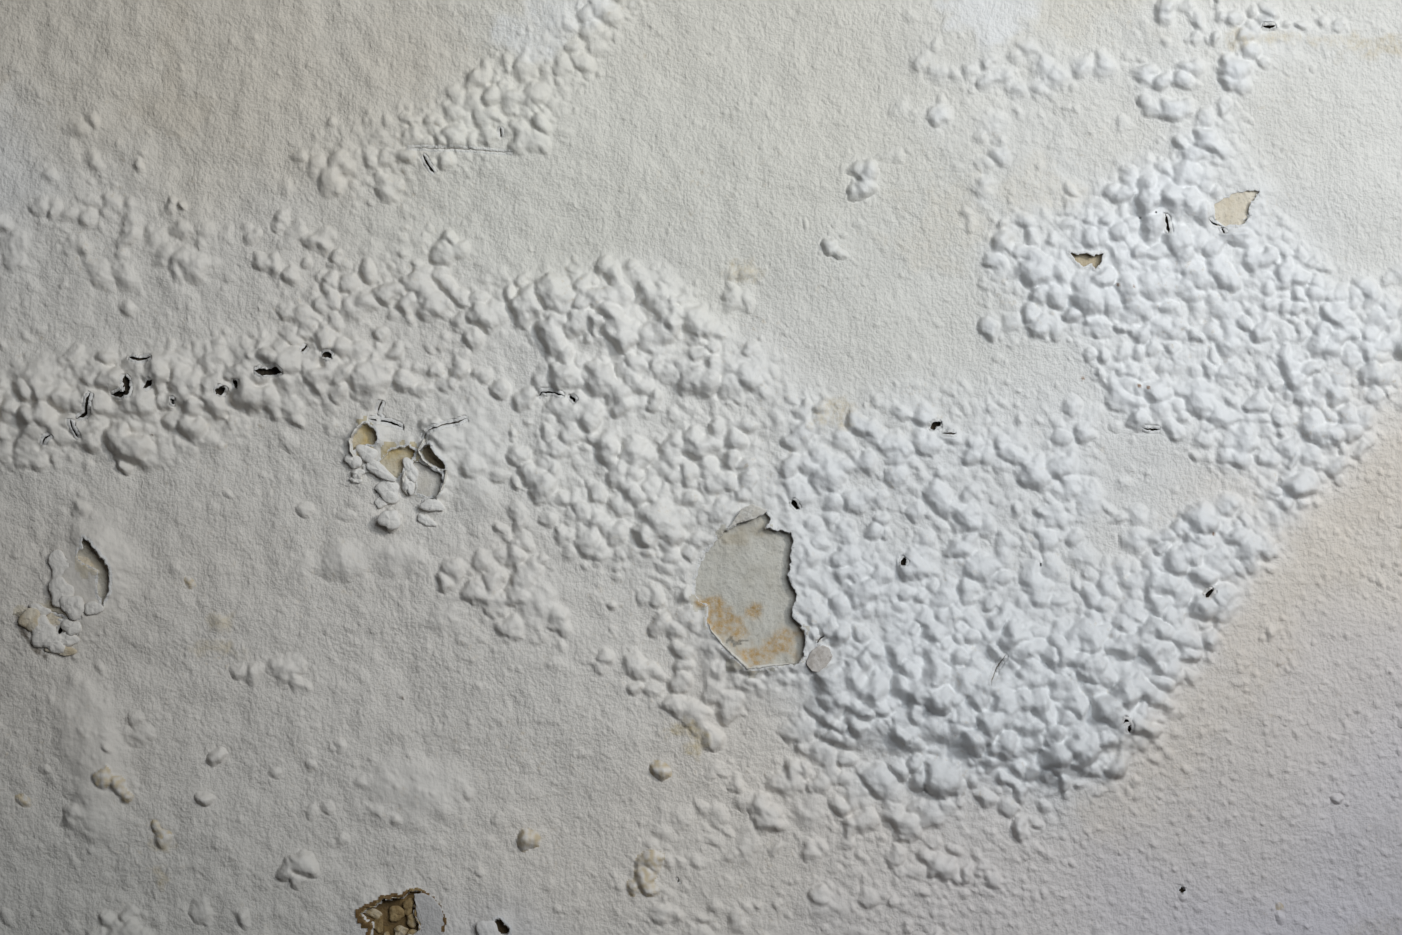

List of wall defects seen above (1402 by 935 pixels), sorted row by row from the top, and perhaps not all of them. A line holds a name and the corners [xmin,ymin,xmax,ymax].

peeling [1065,248,1110,274]
peeling [1209,186,1265,230]
peeling [329,416,452,530]
peeling [13,532,114,662]
peeling [689,504,832,690]
peeling [341,872,447,935]